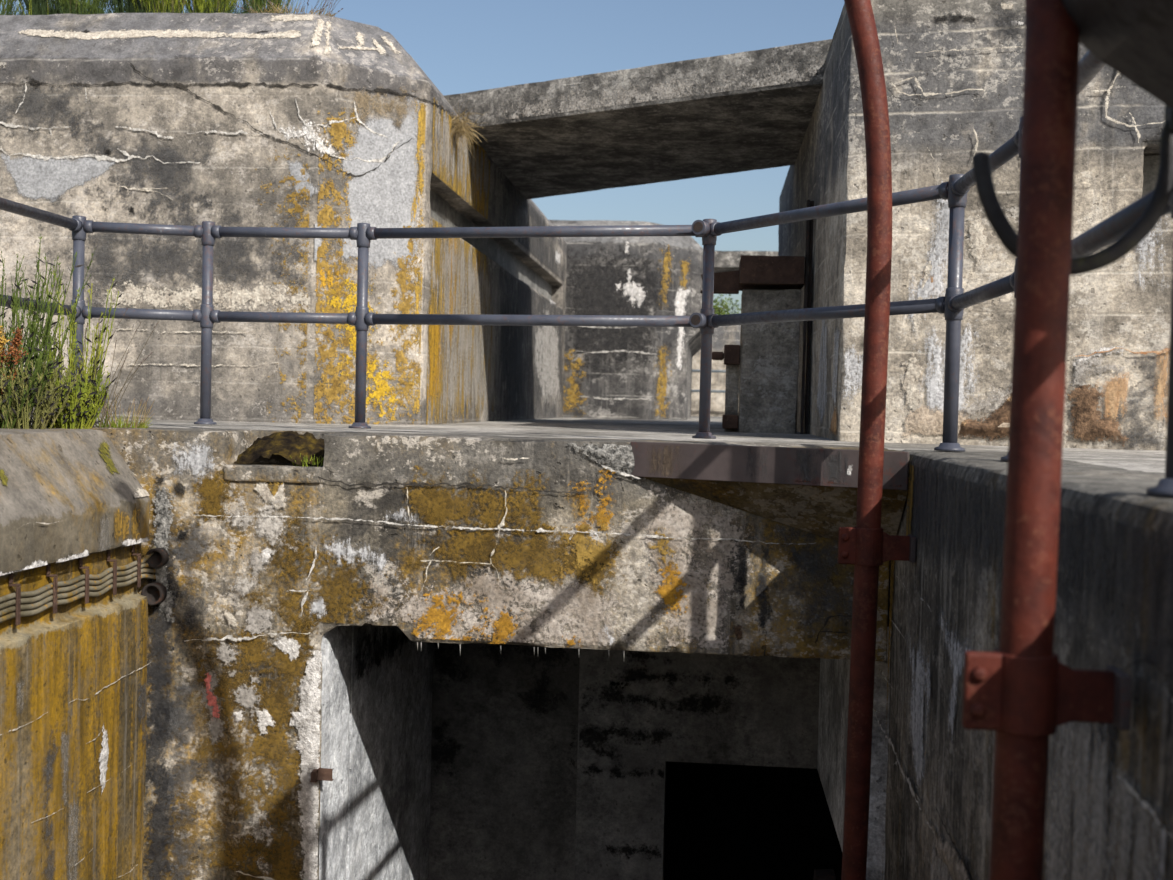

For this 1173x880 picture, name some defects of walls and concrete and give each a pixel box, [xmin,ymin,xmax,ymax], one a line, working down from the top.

crack [0,63,466,200]
crack [1092,73,1164,143]
water stain [1138,224,1165,284]
spalling [959,394,1011,441]
spalling [1066,356,1130,446]
rust [796,450,853,484]
water stain [325,541,386,570]
water stain [311,599,325,617]
water stain [138,443,230,880]
crack [873,668,973,880]
water stain [1046,722,1166,880]
crack [1117,647,1173,837]